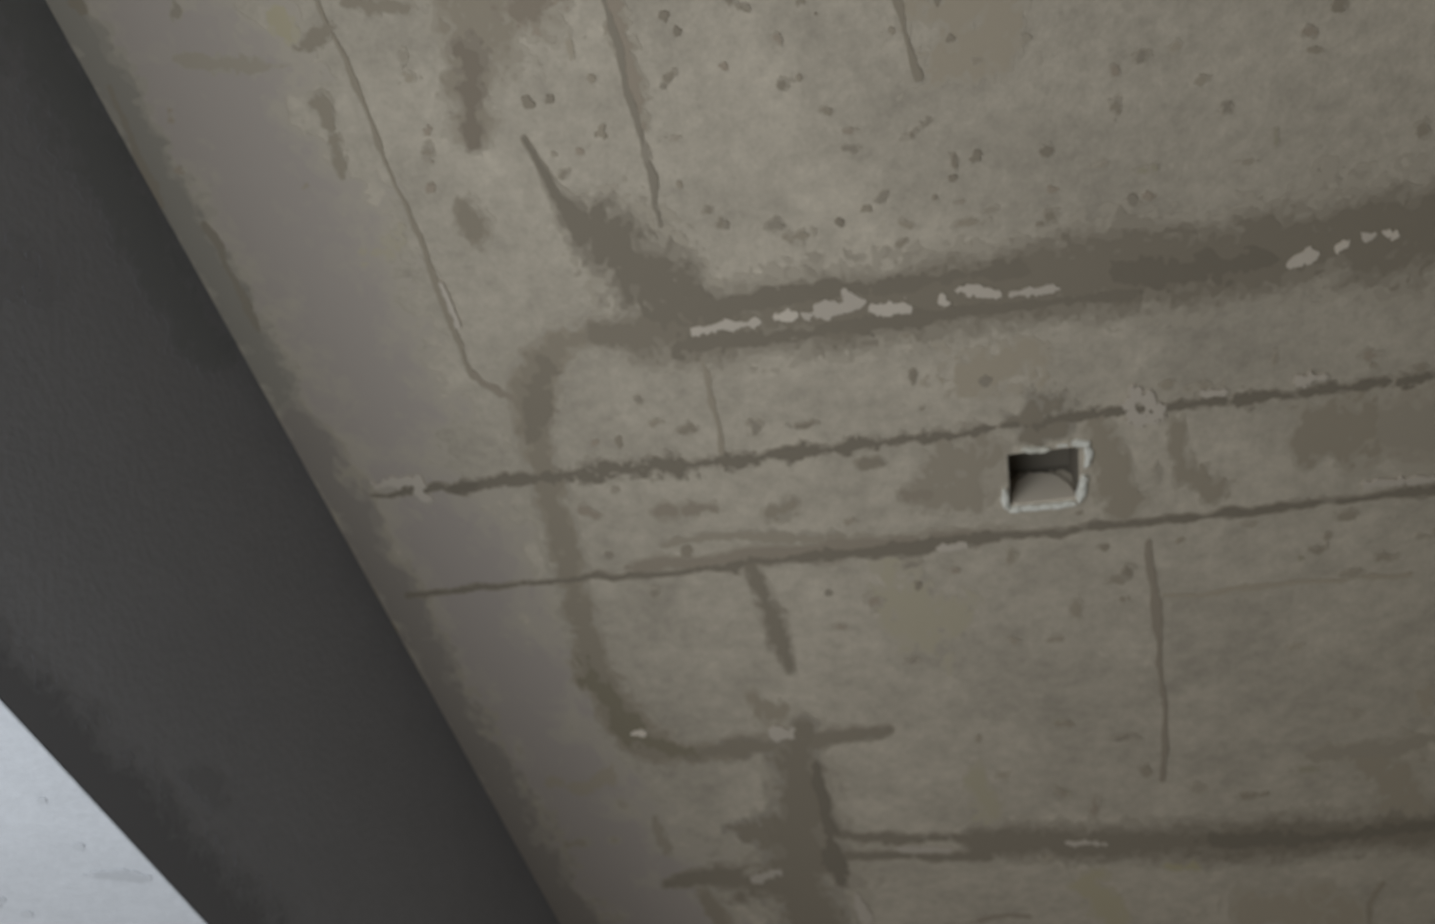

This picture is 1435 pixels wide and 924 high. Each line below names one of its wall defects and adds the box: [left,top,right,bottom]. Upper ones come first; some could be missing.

water stain [0,0,741,924]
crack [314,0,515,402]
crack [602,0,663,228]
water stain [623,494,1017,676]
crack [367,360,1435,500]
crack [405,482,1435,783]
water stain [499,134,1435,521]
water stain [553,581,1435,924]